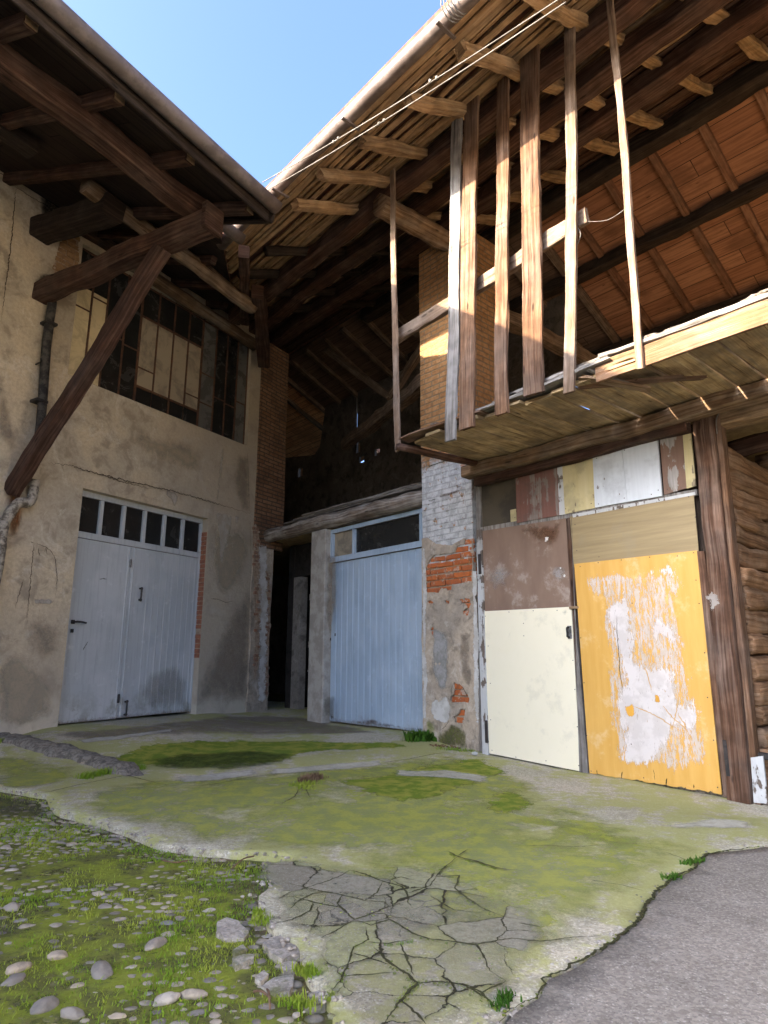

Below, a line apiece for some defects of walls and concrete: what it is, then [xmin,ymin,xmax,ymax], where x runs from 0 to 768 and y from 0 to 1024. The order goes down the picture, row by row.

crack [55,463,239,511]
spalling [422,538,479,729]
peeling [587,565,705,771]
crack [265,845,767,1024]